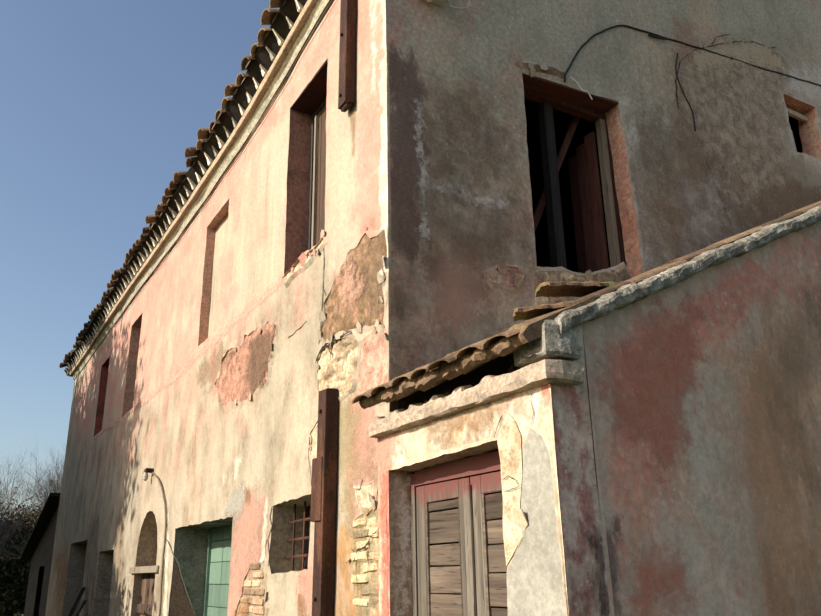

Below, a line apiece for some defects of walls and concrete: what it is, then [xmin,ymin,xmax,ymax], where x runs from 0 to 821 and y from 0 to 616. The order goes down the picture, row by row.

damp [389,44,510,265]
spalling [521,60,568,83]
peeling [664,34,821,227]
peeling [214,315,279,415]
spalling [282,230,328,289]
spalling [316,224,389,403]
flaking render [481,260,631,306]
peeling [166,539,195,616]
flaking render [232,494,271,616]
flaking render [345,402,402,616]
peeling [497,394,569,616]
damp [588,517,621,616]